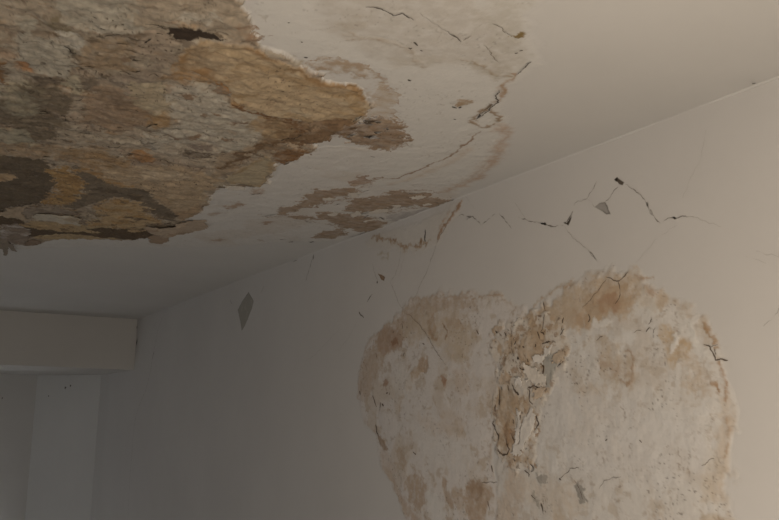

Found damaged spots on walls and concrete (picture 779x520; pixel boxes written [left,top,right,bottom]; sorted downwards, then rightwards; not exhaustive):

peeling [0,0,463,256]
water stain [247,0,551,195]
crack [369,7,498,62]
crack [476,92,500,119]
crack [459,176,721,261]
spalling [486,301,574,478]
water stain [356,261,745,520]